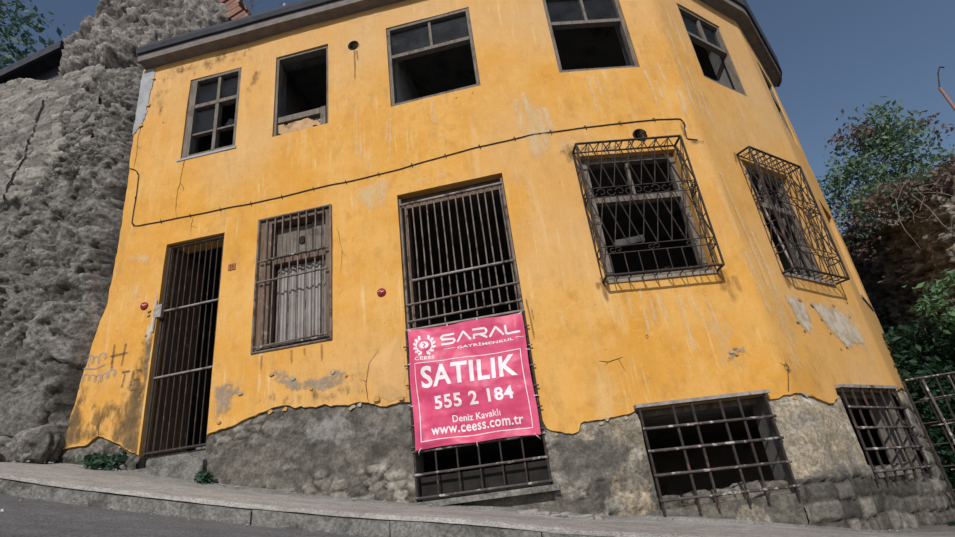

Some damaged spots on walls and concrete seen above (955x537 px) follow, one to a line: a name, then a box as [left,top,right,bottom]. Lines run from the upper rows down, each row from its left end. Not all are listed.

crack [0,99,44,209]
peeling [785,294,865,348]
peeling [269,370,347,390]
flaking render [205,383,417,503]